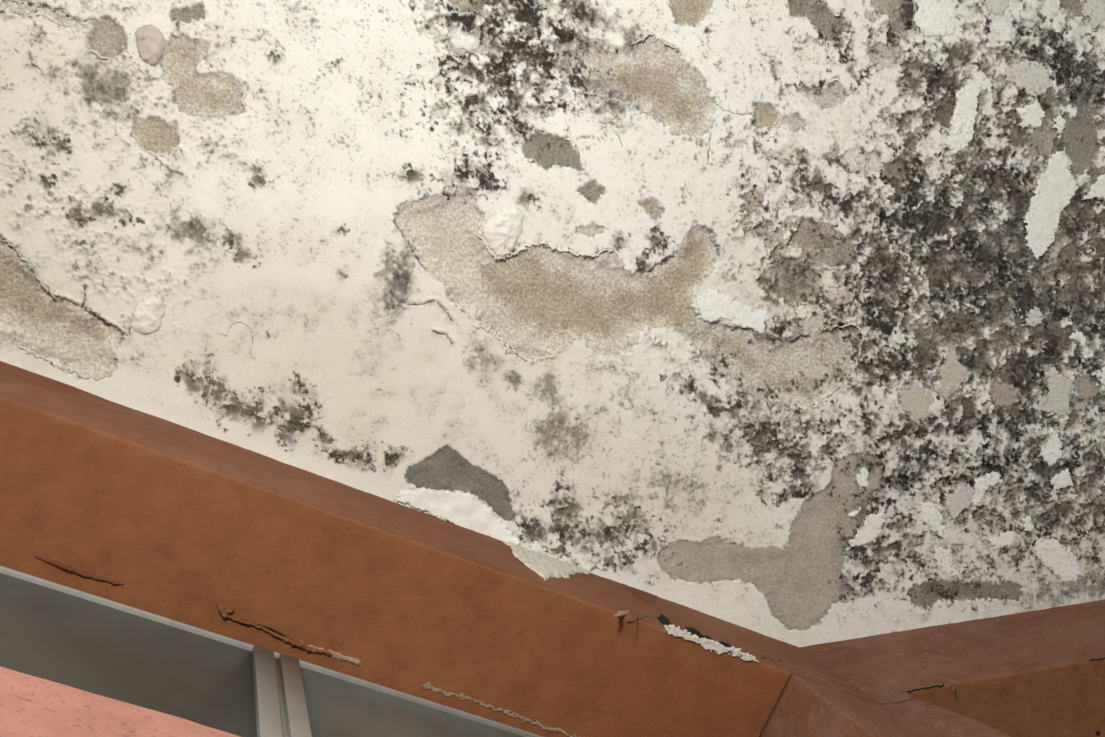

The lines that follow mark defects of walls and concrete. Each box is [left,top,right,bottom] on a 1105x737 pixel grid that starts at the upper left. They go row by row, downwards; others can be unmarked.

spalling [132,4,247,157]
water stain [248,161,274,188]
water stain [400,0,640,204]
spalling [394,185,865,412]
spalling [562,31,715,138]
water stain [614,226,675,274]
water stain [660,0,1105,611]
peeling [1004,58,1105,262]
water stain [174,361,405,472]
spalling [393,445,590,580]
water stain [513,473,683,585]
spalling [658,454,887,630]